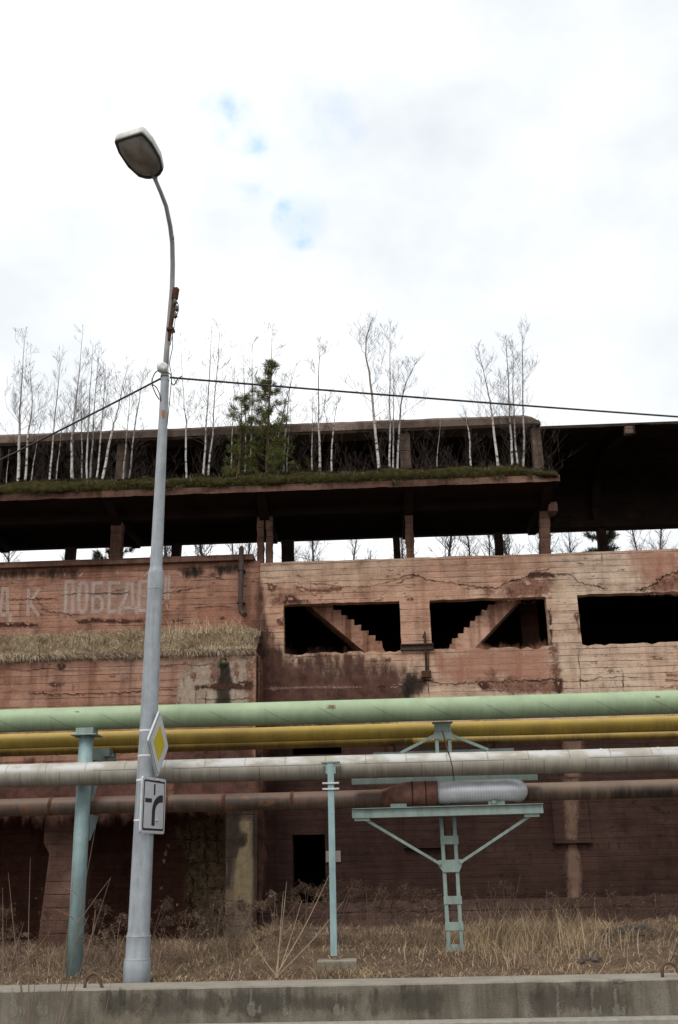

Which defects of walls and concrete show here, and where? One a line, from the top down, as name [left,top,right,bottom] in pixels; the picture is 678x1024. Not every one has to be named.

crack [267,573,527,594]
crack [636,571,678,592]
peeling [176,658,254,704]
leakage [256,641,417,702]